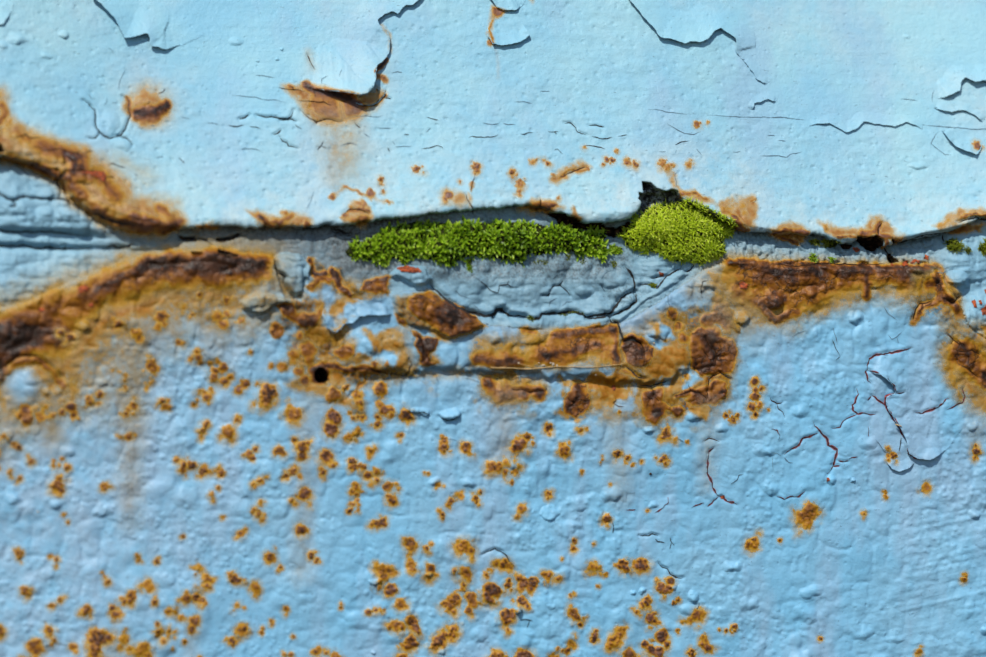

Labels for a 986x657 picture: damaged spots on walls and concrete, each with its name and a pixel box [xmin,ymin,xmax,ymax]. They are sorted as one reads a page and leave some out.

peeling [97,0,204,49]
peeling [293,0,418,106]
peeling [630,0,756,60]
corrosion [284,57,389,164]
crack [303,192,368,234]
spalling [637,181,684,216]
crack [778,216,986,267]
peeling [323,298,393,333]
corrosion [0,87,986,537]
crack [770,298,980,474]
corrosion [69,564,262,657]
corrosion [548,557,714,657]